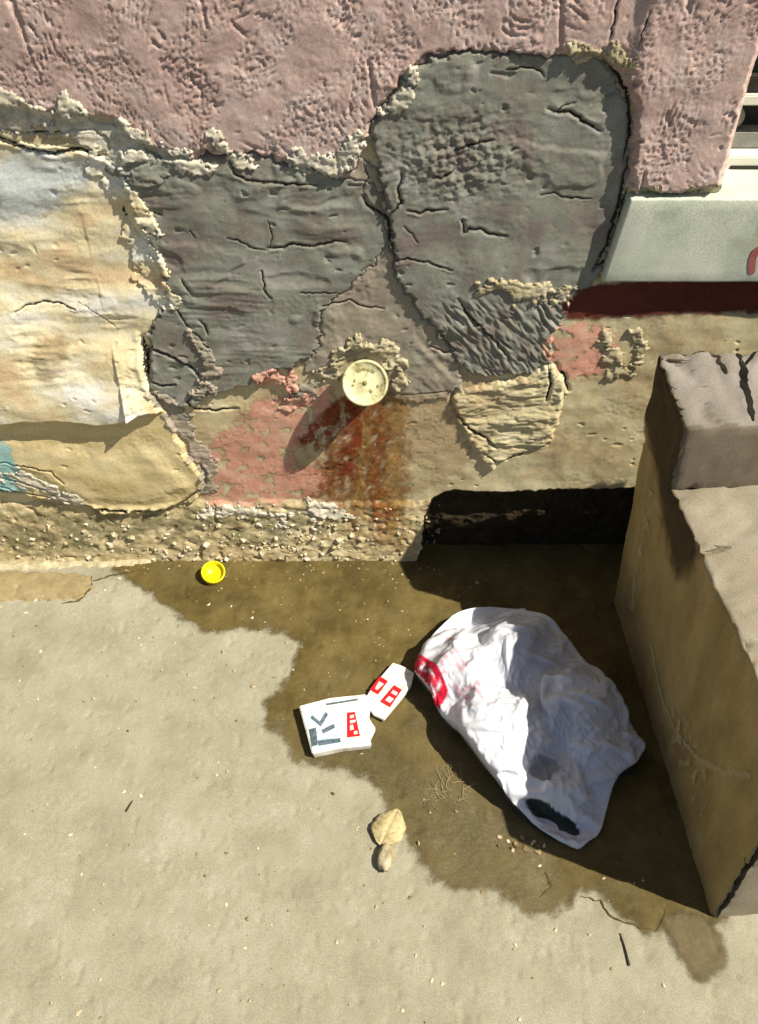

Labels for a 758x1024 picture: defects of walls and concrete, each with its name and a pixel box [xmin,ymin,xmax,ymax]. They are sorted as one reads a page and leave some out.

flaking render [376,64,420,117]
crack [548,103,600,131]
flaking render [565,39,639,76]
flaking render [0,87,372,529]
crack [143,279,238,412]
crack [227,222,340,297]
crack [363,164,506,270]
crack [546,364,568,400]
crack [693,351,758,421]
corrosion [299,393,411,544]
leakage [644,355,700,576]
leakage [112,543,728,983]